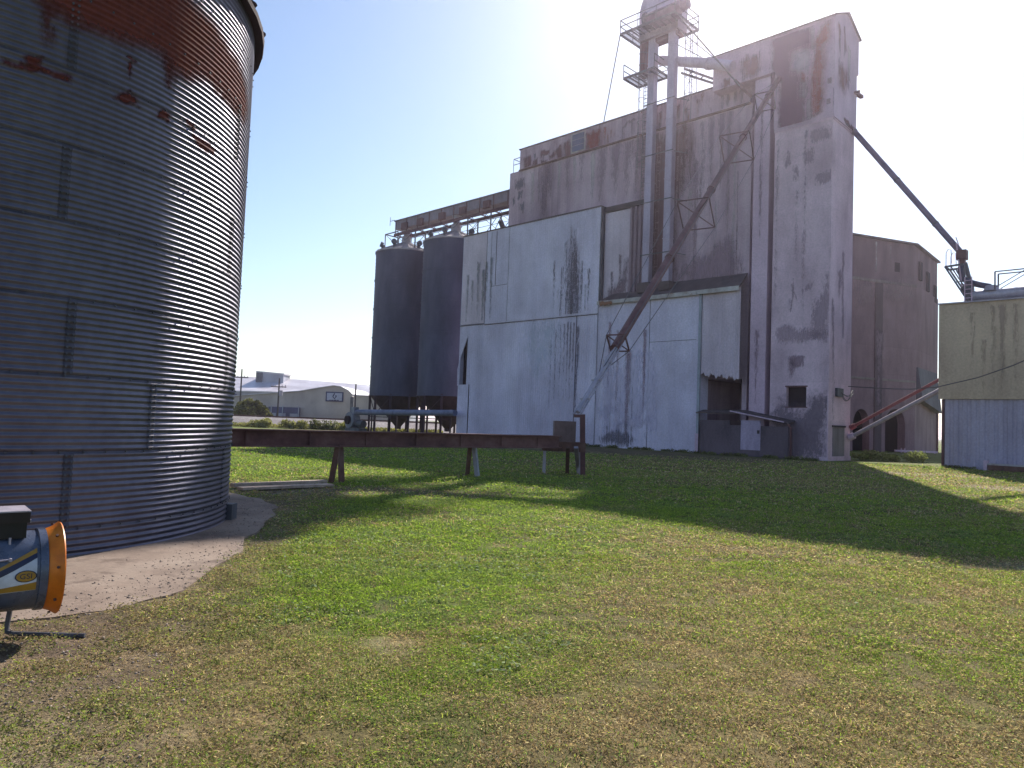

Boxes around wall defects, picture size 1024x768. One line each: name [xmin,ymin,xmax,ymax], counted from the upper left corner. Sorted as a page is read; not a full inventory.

corrosion [4,55,72,81]
corrosion [40,0,248,122]
corrosion [186,119,215,154]
water stain [467,259,493,319]
water stain [548,231,590,402]
water stain [777,252,844,367]
water stain [599,323,646,447]